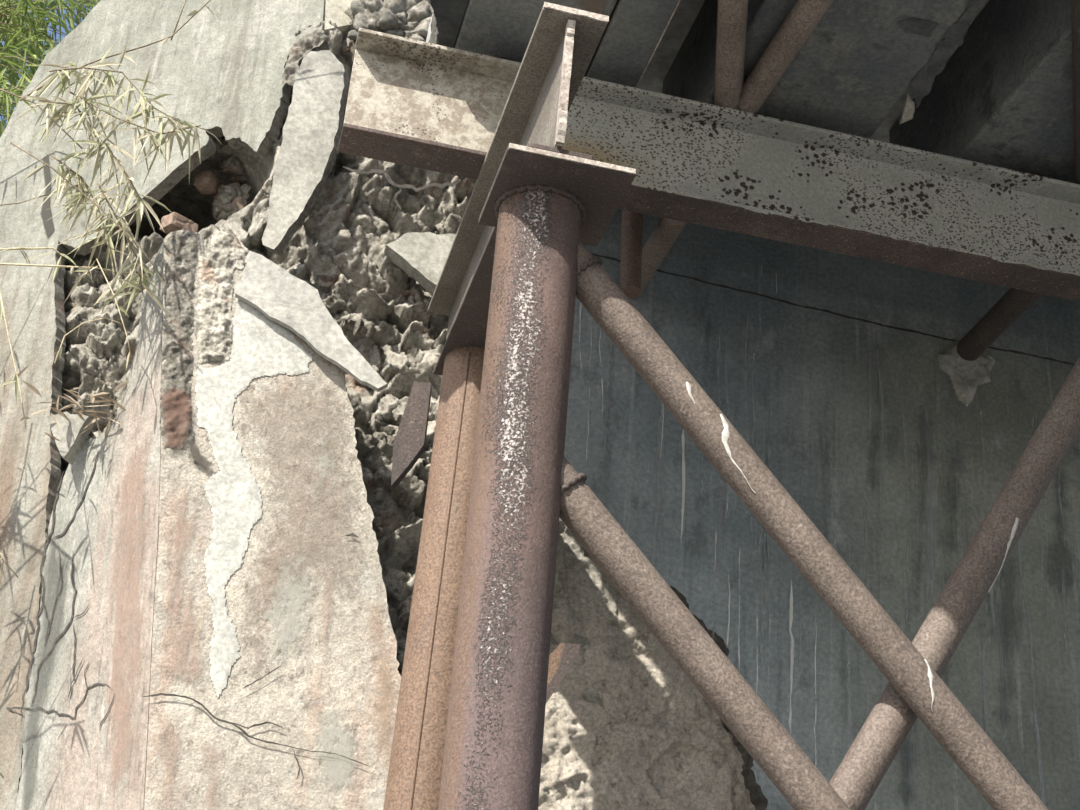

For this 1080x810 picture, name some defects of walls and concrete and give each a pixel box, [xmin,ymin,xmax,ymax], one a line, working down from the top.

spalling [282,29,331,86]
spalling [428,12,439,45]
crack [592,253,620,262]
crack [656,269,959,342]
crack [988,346,1075,365]
peeling [159,226,313,698]
crack [7,451,115,731]
damp [727,554,740,672]
spalling [538,517,768,810]
crack [143,693,371,778]